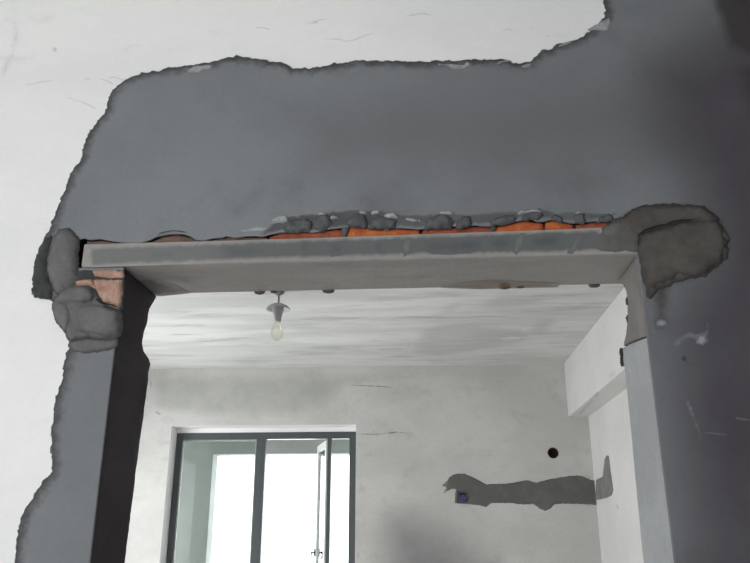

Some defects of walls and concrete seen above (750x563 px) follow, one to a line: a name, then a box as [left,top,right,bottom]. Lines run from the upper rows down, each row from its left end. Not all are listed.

spalling [149,235,196,243]
spalling [214,207,618,241]
flaking render [75,270,125,309]